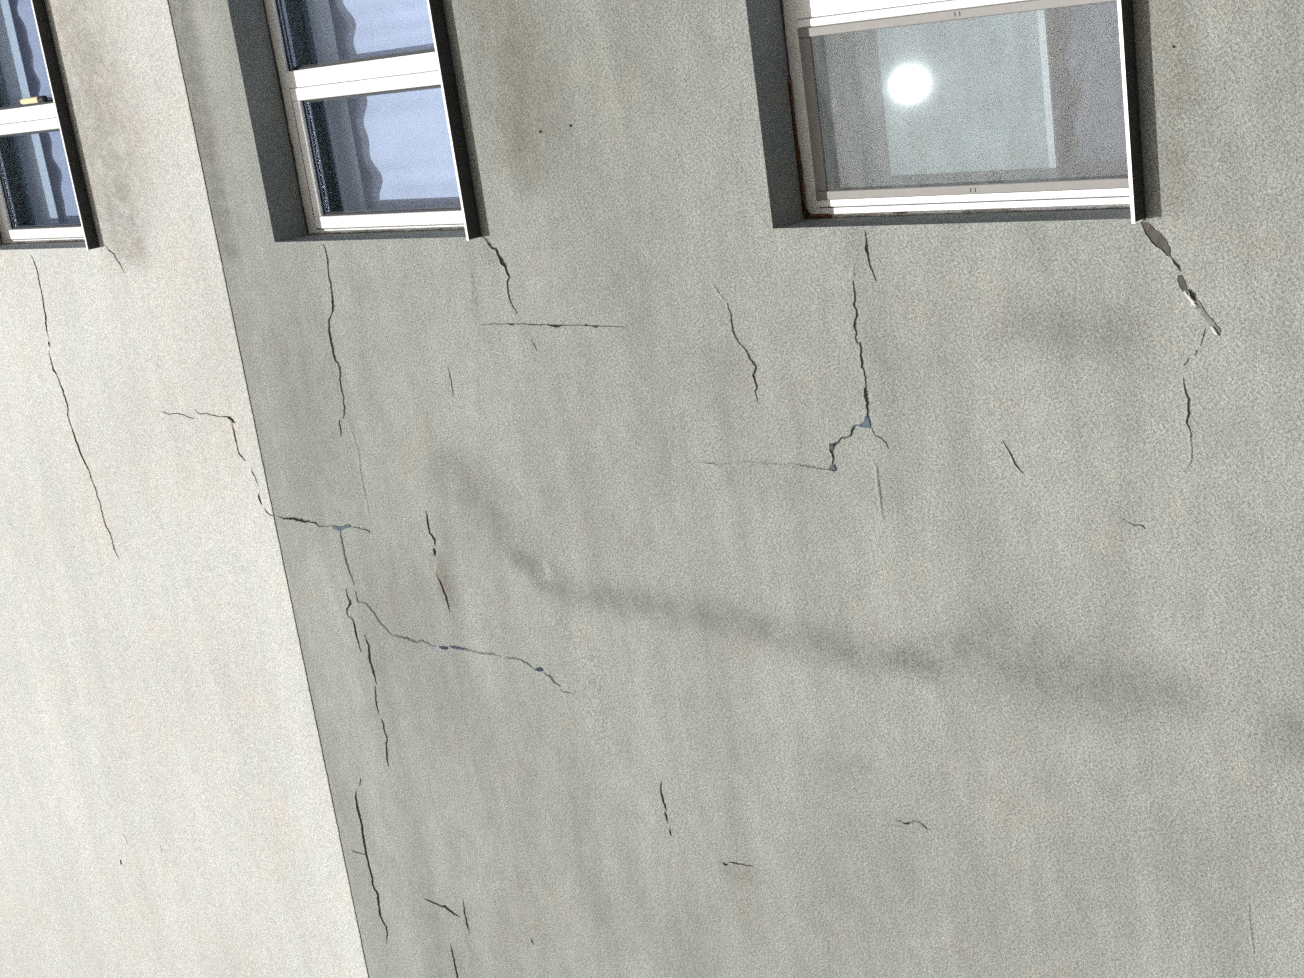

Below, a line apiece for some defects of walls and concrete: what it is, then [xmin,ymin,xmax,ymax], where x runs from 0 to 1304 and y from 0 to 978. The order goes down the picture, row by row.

crack [30,255,117,555]
crack [480,235,617,349]
crack [727,303,758,402]
crack [785,231,889,473]
crack [1136,219,1220,439]
crack [163,409,572,945]